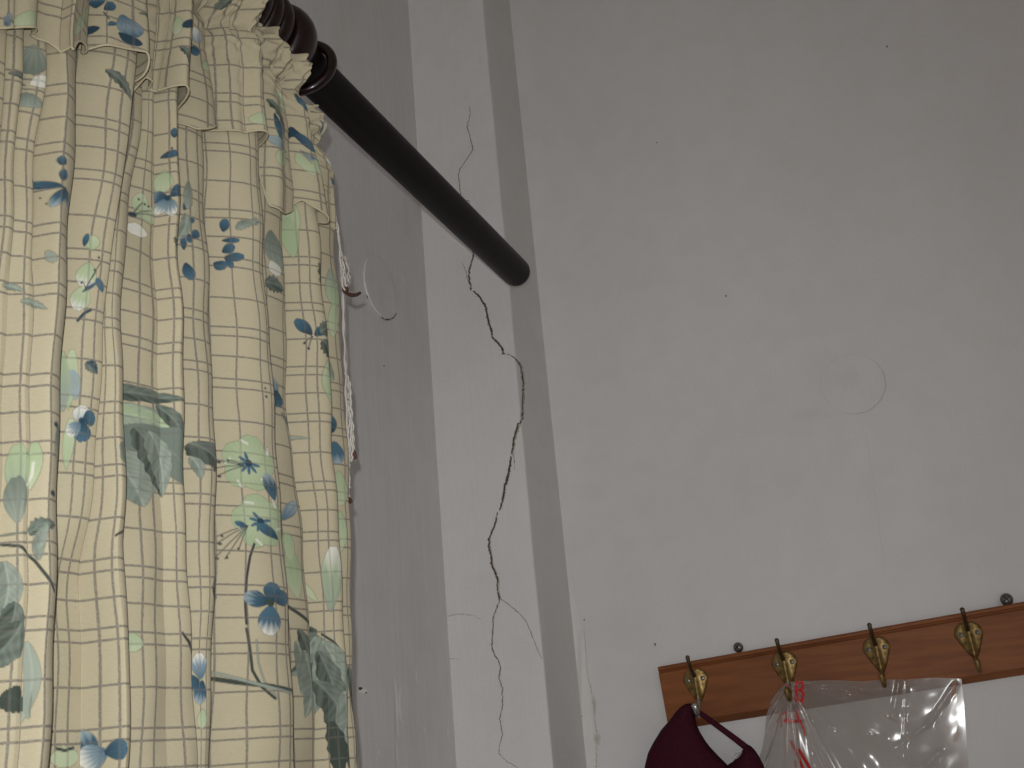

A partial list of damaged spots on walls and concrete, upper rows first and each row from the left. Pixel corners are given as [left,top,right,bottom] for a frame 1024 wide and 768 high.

crack [458,106,473,201]
crack [448,251,542,768]